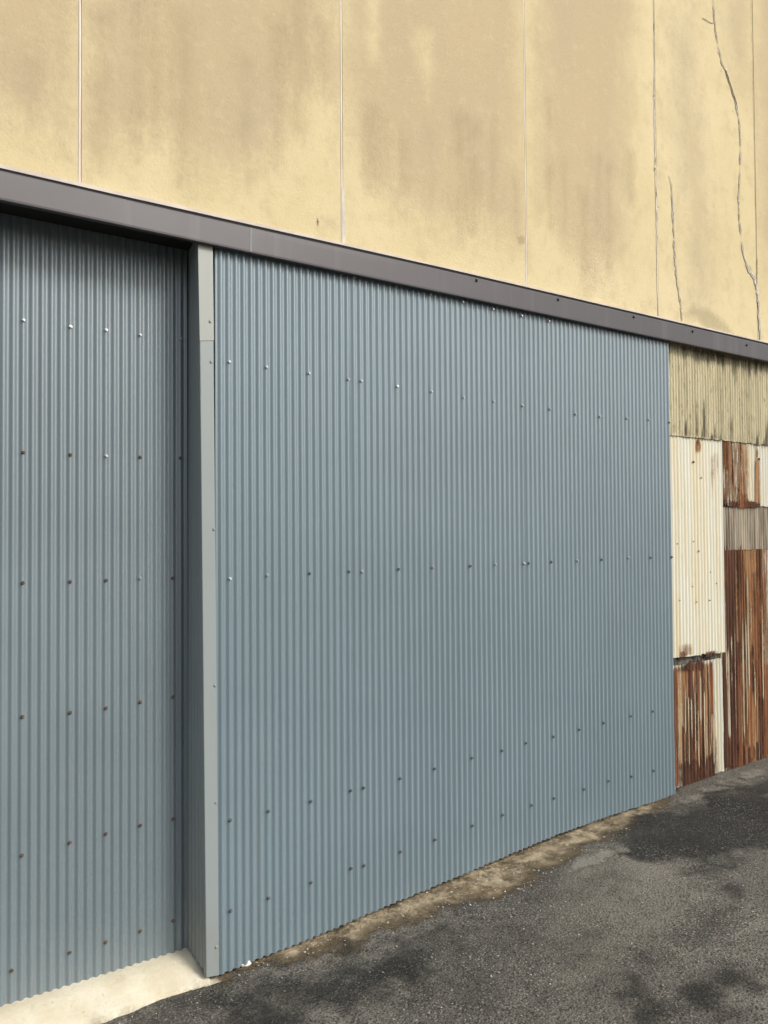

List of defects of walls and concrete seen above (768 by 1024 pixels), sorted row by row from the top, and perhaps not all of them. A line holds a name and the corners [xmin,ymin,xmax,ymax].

crack [653,21,682,319]
crack [703,1,762,340]
leakage [685,407,733,440]
leakage [669,345,764,377]
corrosion [713,440,760,508]
corrosion [673,546,768,788]